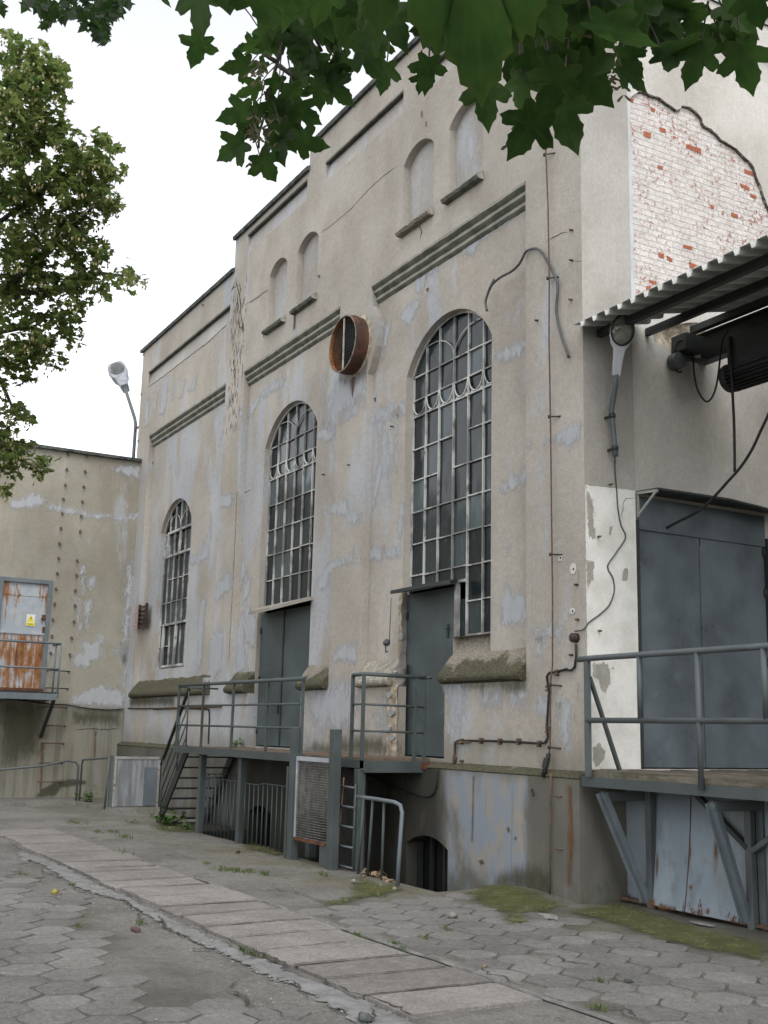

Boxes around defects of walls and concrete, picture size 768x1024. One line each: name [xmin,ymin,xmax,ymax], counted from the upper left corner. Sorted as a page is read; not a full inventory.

flaking render [630,91,768,295]
peeling [112,464,140,479]
peeling [9,493,138,522]
peeling [586,486,595,539]
peeling [557,552,594,588]
peeling [71,560,139,707]
peeling [593,662,614,692]
peeling [592,743,606,767]